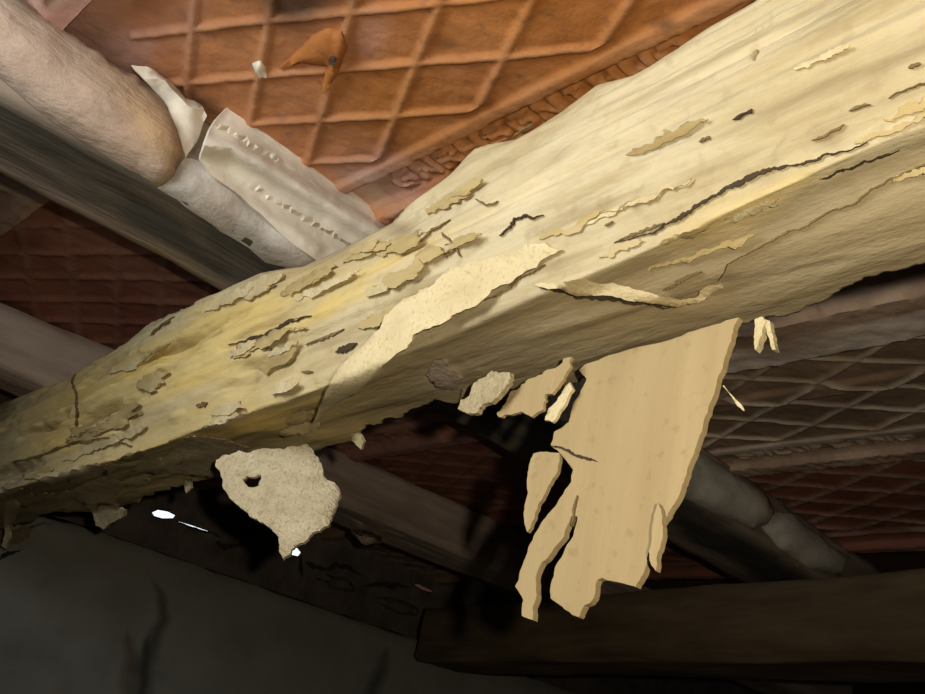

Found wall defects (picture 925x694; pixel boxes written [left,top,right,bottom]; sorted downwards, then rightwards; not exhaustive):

crack [474,62,925,310]
peeling [159,177,693,561]
crack [0,523,51,560]